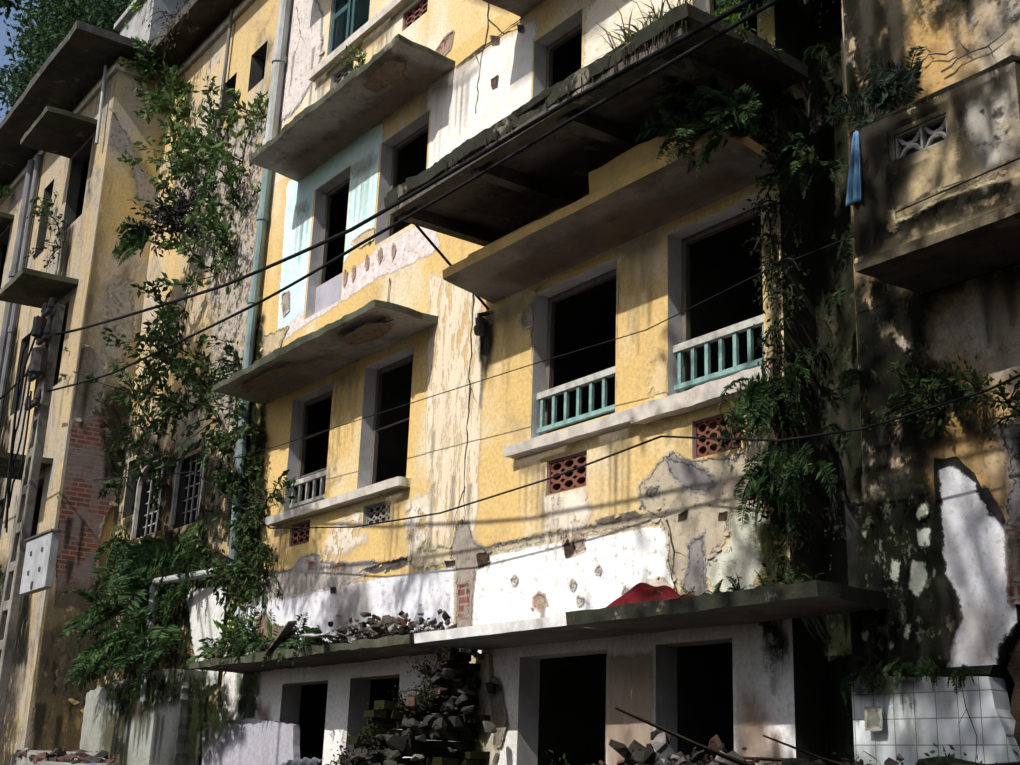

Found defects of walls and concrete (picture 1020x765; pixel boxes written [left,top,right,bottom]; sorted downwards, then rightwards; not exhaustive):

peeling [279,0,324,122]
crack [921,31,1006,73]
peeling [892,169,1007,223]
peeling [172,109,266,463]
peeling [260,291,290,358]
leakage [827,0,1012,672]
peeling [246,431,765,640]
peeling [978,416,1020,605]
spalling [1007,629,1020,749]